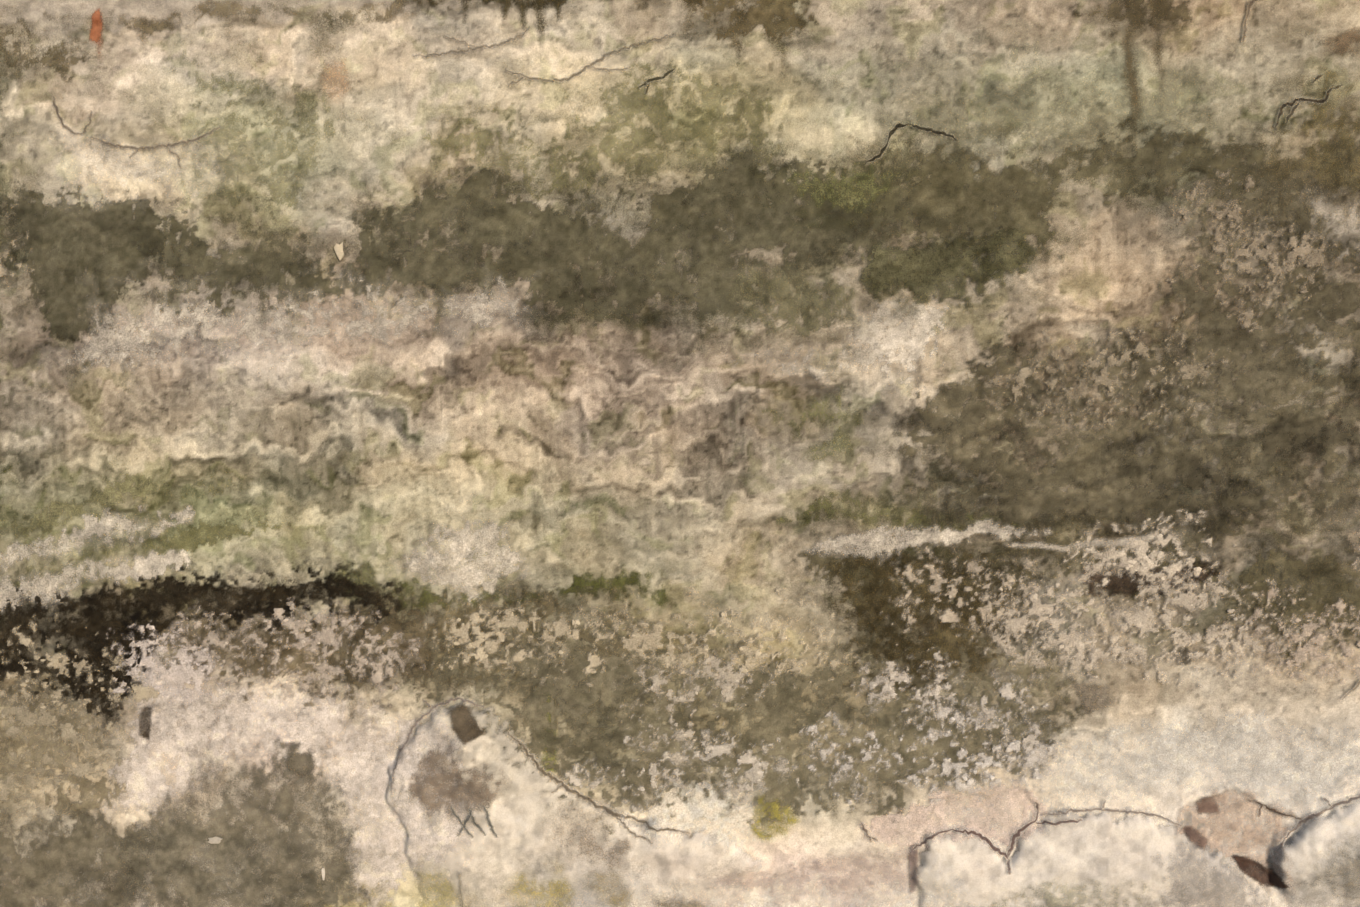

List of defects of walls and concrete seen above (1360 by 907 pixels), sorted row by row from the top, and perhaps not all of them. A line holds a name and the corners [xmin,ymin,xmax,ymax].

corrosion [89,9,103,43]
damp [120,0,298,41]
damp [319,0,572,53]
crack [1275,75,1342,127]
crack [866,123,958,163]
damp [726,636,760,658]
flaking render [0,510,1360,901]
crack [507,730,691,844]
damp [930,771,957,788]
crack [861,823,878,842]
crack [913,800,1183,875]
crack [1247,795,1360,846]